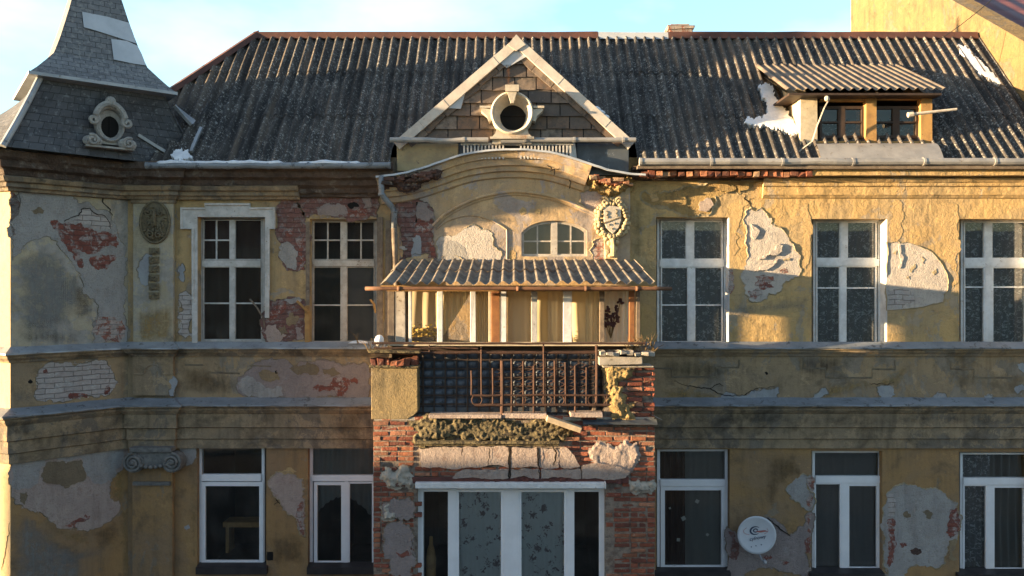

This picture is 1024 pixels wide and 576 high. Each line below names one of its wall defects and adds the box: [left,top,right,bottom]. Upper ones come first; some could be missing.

peeling [6,191,153,343]
flaking render [275,198,380,272]
spalling [394,198,516,262]
flaking render [579,174,813,303]
flaking render [885,200,961,311]
flaking render [259,296,306,342]
flaking render [33,359,118,403]
peeling [236,357,371,398]
crack [677,382,772,397]
peeling [8,448,128,532]
peeling [724,473,817,576]
peeling [879,482,963,576]